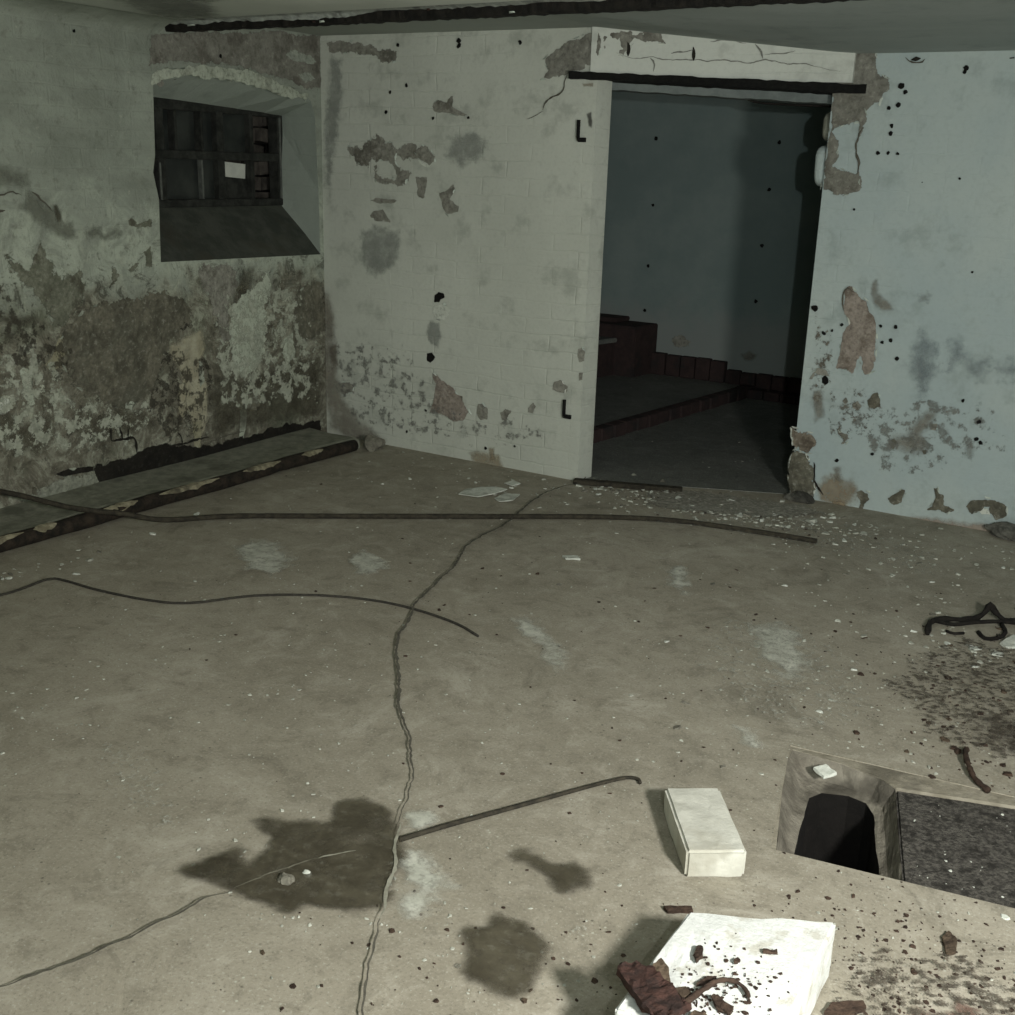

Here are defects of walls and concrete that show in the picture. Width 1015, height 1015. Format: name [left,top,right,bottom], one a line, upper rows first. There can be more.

flaking render [541,31,666,81]
flaking render [347,133,436,198]
flaking render [820,53,908,196]
flaking render [0,240,326,482]
water stain [170,271,487,448]
peeling [809,286,897,385]
water stain [0,414,51,451]
flaking render [787,426,816,497]
crack [361,477,591,1015]
water stain [181,799,441,917]
water stain [514,850,590,892]
water stain [463,916,547,996]